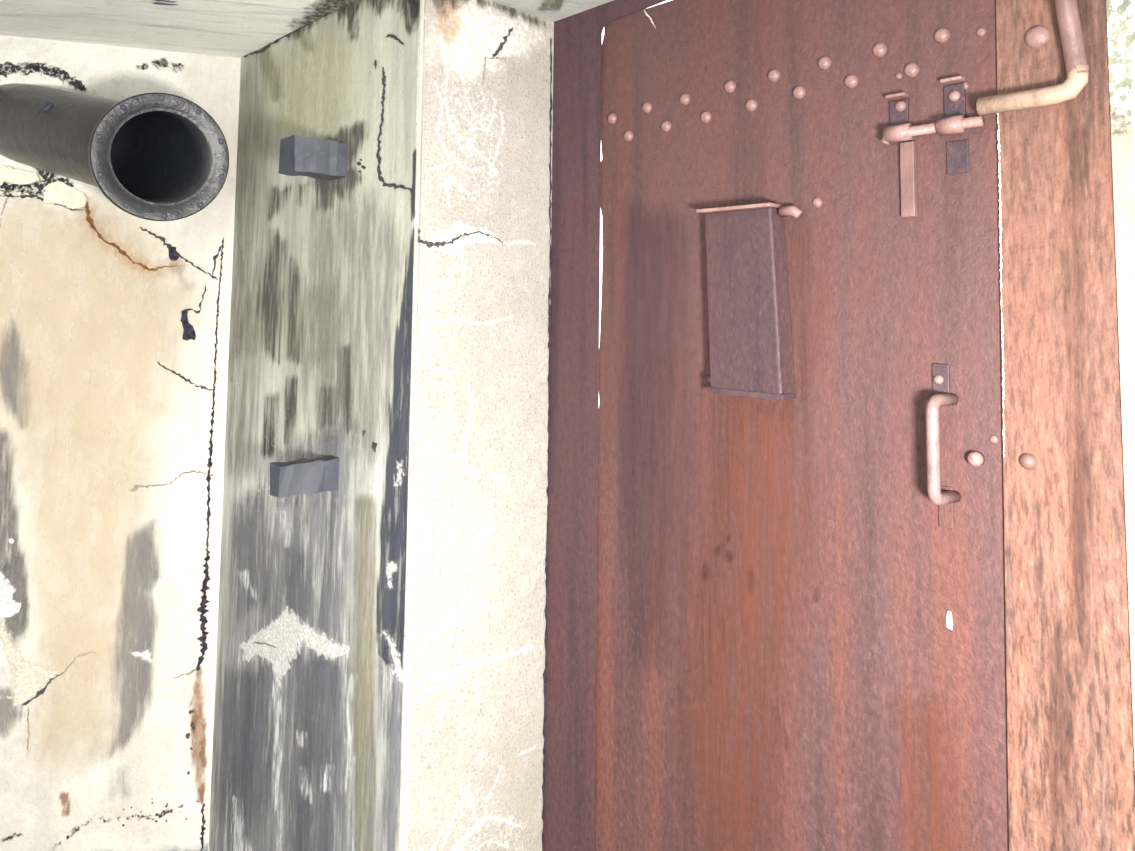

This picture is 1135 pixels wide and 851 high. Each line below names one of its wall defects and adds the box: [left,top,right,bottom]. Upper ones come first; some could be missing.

flaking render [0,61,86,91]
damp [243,0,420,98]
crack [483,28,513,83]
flaking render [0,165,87,211]
damp [0,435,27,640]
crack [85,202,224,678]
damp [197,123,403,851]
crack [374,40,553,851]
peeling [0,572,59,706]
damp [117,528,158,746]
corrosion [186,670,206,804]
crack [199,803,207,851]